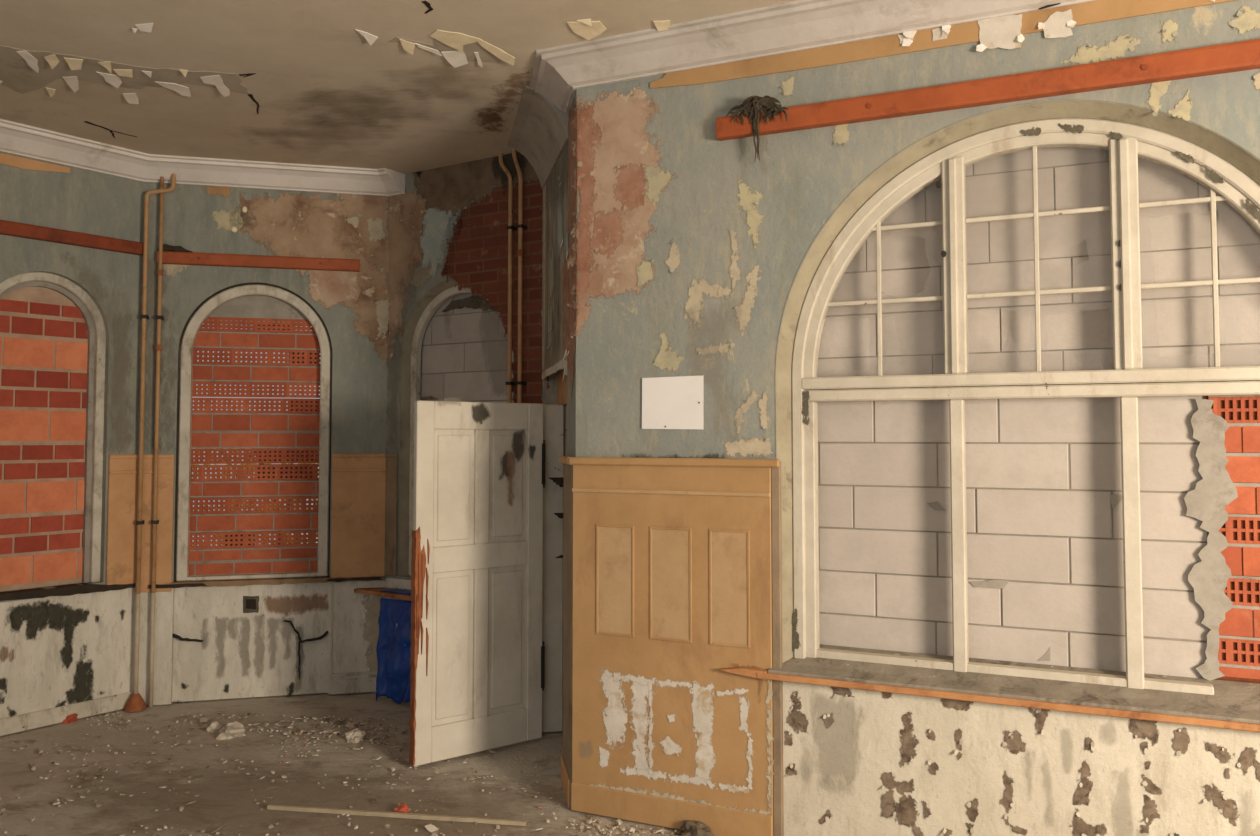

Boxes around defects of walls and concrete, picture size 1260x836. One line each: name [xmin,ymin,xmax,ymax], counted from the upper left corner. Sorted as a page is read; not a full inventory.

flaking render [976,14,1025,52]
peeling [1038,9,1141,65]
peeling [0,46,250,104]
flaking render [206,87,681,404]
flaking render [785,686,855,746]
flaking render [1003,730,1026,755]
flaking render [1029,708,1050,736]
flaking render [880,712,939,836]
flaking render [966,798,979,836]
flaking render [1000,770,1028,836]
flaking render [1071,737,1109,836]
flaking render [1128,719,1260,834]